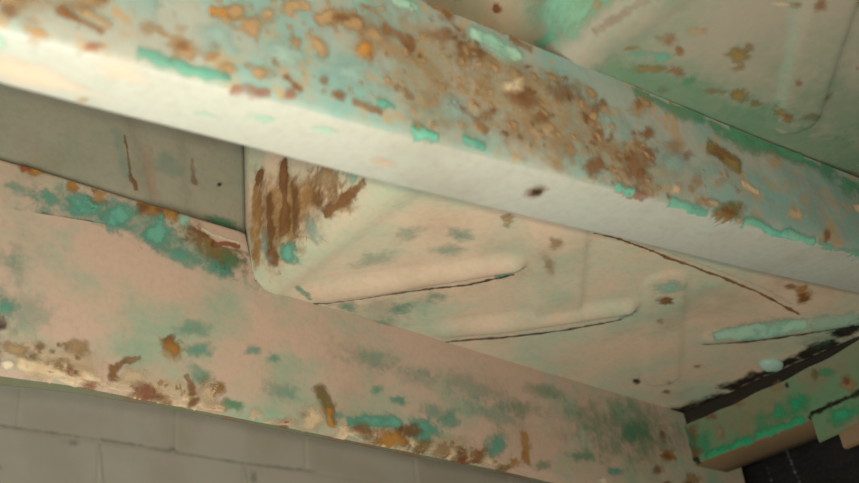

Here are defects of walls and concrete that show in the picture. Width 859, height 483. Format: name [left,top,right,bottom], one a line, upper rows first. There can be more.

peeling [138,48,230,80]
rust [209,0,465,128]
peeling [469,27,522,61]
rust [427,2,741,227]
peeling [210,217,234,230]
rust [251,158,366,265]
crack [593,233,840,345]
peeling [713,314,859,341]
rust [4,340,226,412]
rust [249,386,529,472]
peeling [702,396,807,459]
leakage [808,390,859,420]